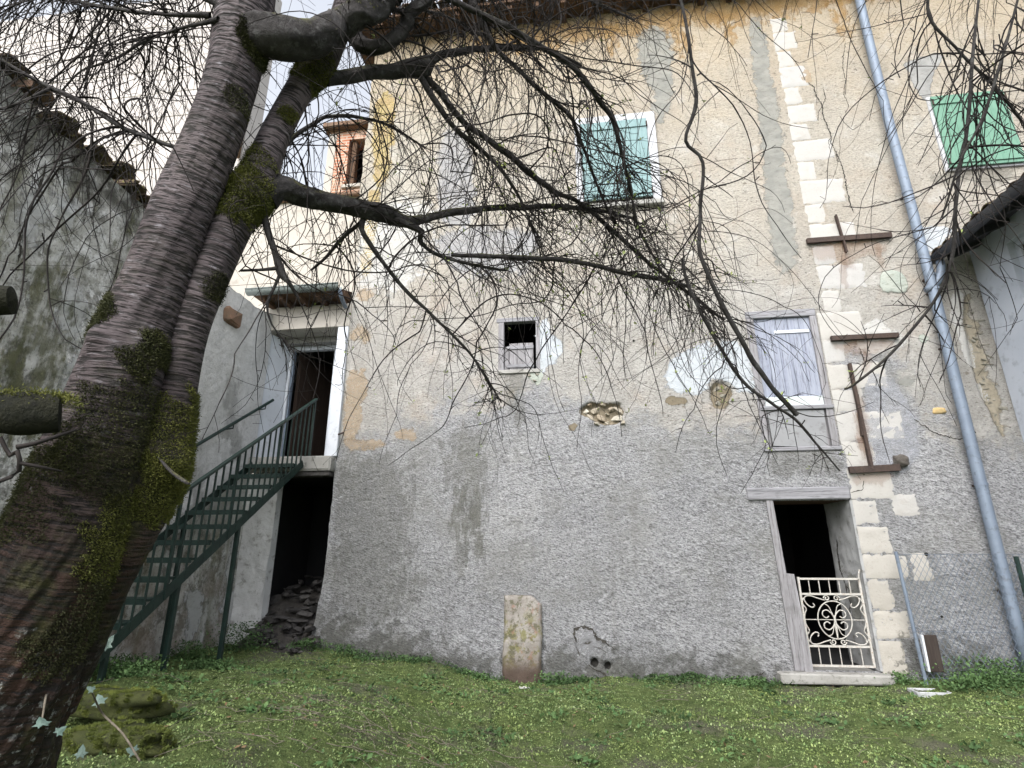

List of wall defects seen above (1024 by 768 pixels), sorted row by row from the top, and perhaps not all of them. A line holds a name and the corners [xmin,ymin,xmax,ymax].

spalling [568,402,625,431]
spalling [962,294,1008,437]